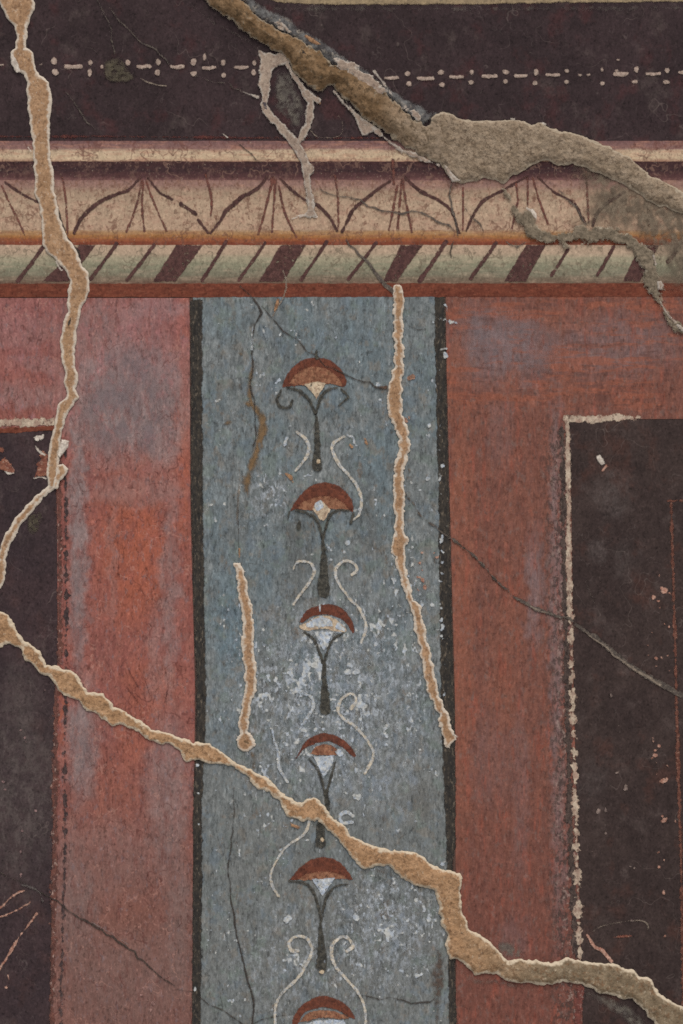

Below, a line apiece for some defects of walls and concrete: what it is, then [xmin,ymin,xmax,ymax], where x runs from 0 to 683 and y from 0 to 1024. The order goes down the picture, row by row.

crack [0,0,90,589]
crack [206,0,683,333]
crack [240,240,683,748]
crack [0,511,683,1024]